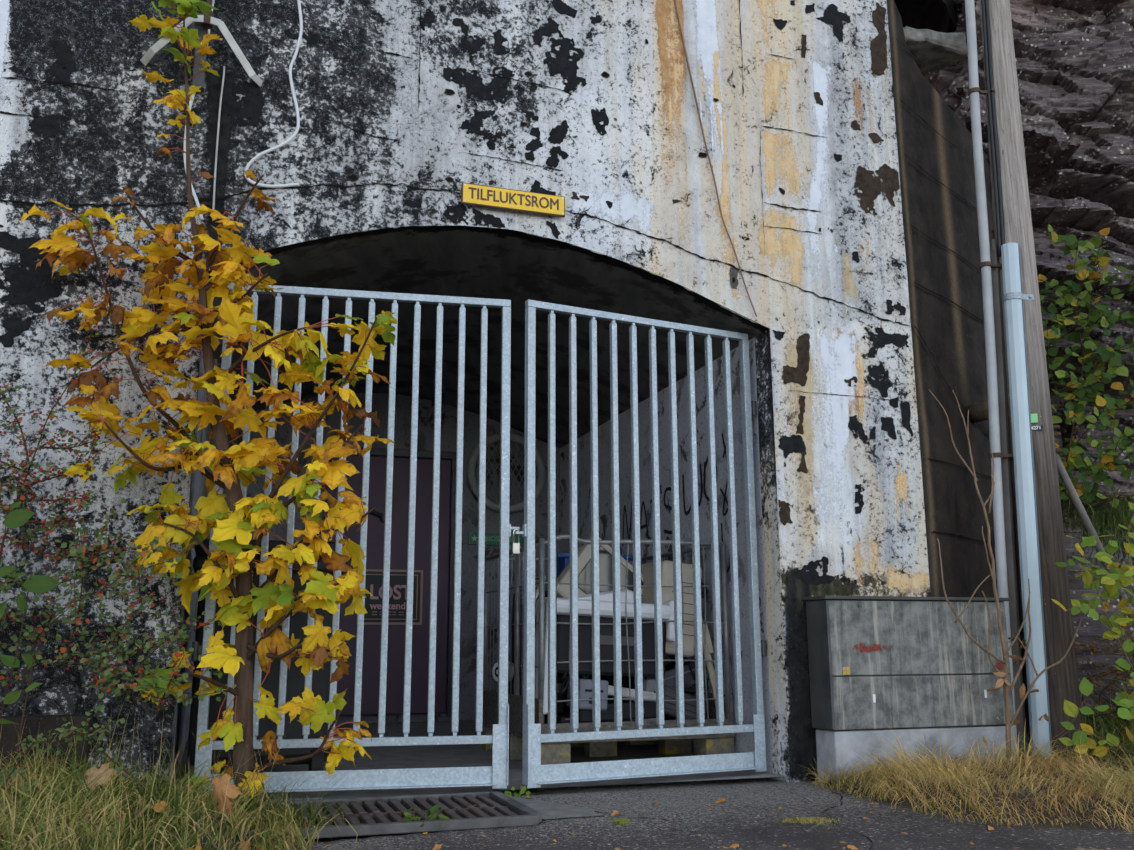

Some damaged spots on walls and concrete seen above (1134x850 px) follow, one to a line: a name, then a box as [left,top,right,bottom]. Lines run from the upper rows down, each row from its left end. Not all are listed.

leakage [0,0,10,111]
leakage [203,71,235,260]
peeling [443,18,515,150]
peeling [524,111,569,168]
peeling [532,0,586,94]
peeling [591,108,609,135]
rust [655,0,686,163]
peeling [853,164,900,215]
crack [566,208,989,435]
peeling [773,330,810,473]
peeling [844,326,914,443]
peeling [855,484,865,514]